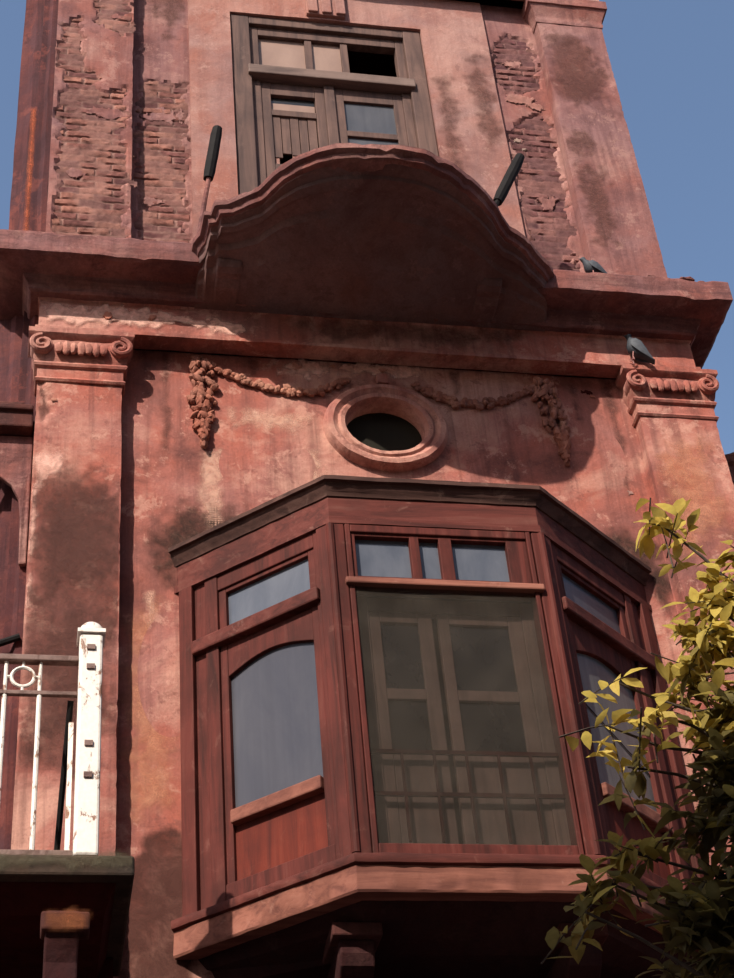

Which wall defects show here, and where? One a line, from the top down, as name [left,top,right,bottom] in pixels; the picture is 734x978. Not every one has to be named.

flaking render [92,0,136,37]
flaking render [51,18,191,243]
flaking render [490,37,580,271]
flaking render [45,303,245,334]
damp [18,469,119,775]
damp [155,455,233,579]